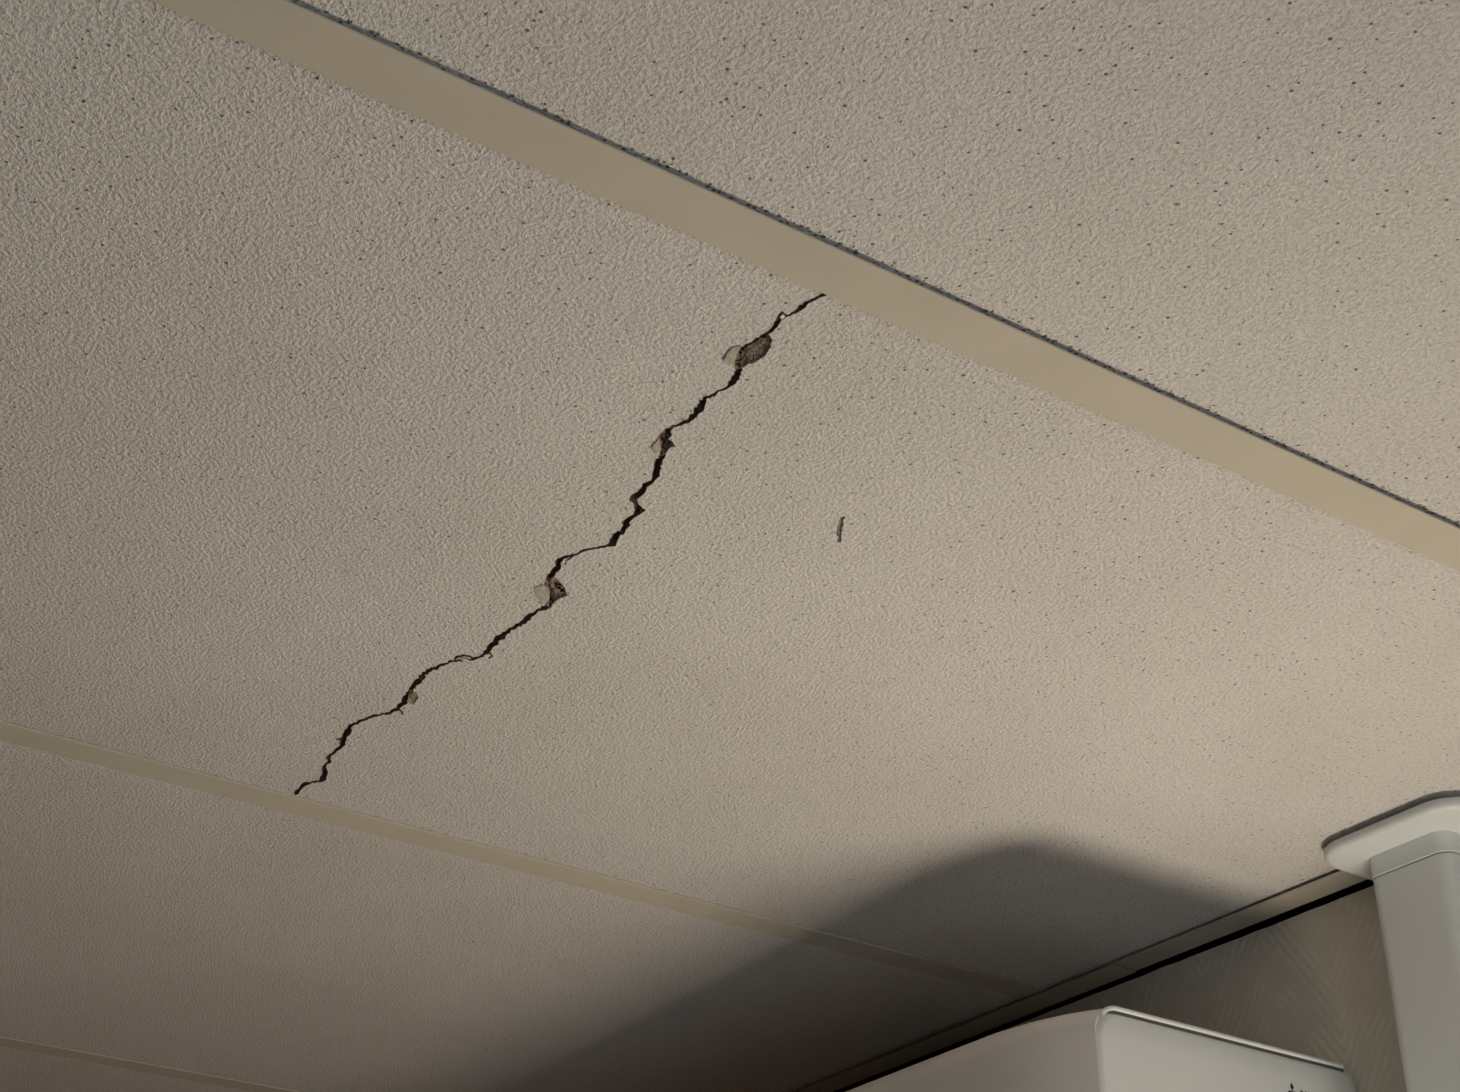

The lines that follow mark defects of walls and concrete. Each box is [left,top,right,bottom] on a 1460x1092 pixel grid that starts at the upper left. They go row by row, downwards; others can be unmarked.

crack [764,293,826,336]
crack [294,362,743,795]